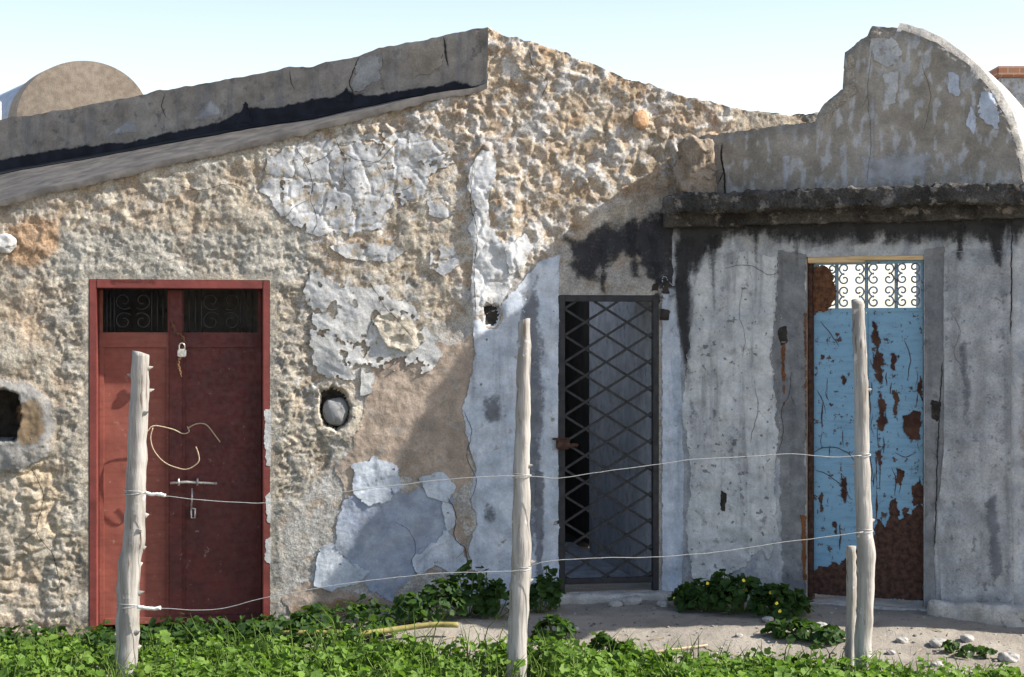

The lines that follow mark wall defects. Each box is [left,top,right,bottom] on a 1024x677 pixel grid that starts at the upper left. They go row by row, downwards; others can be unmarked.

spalling [821,54,857,124]
peeling [869,28,903,105]
peeling [948,72,961,96]
peeling [966,91,1002,134]
peeling [259,131,456,262]
crack [718,146,726,193]
water stain [563,212,1024,363]
peeling [282,150,560,618]
rust [804,265,837,436]
rust [867,321,923,601]
rust [800,515,858,596]